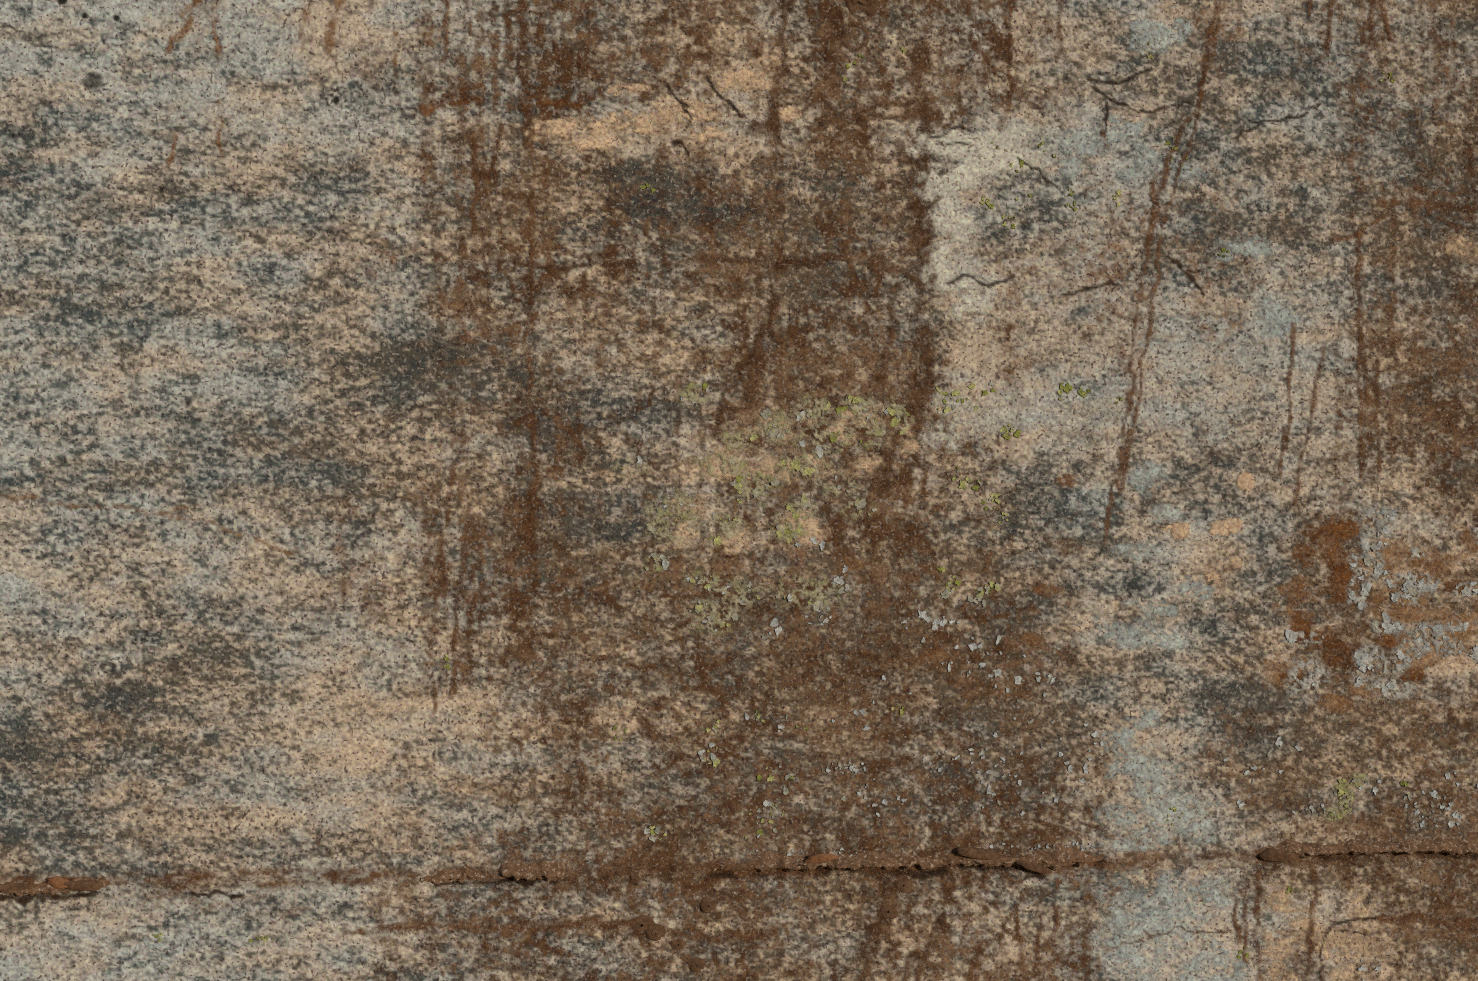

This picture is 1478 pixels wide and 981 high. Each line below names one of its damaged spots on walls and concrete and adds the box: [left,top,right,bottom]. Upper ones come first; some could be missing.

leakage [326,0,344,53]
rust [420,84,482,115]
leakage [350,0,1117,981]
leakage [1231,0,1478,981]
rust [1265,520,1362,683]
rust [1372,528,1478,681]
crack [1314,852,1478,860]
crack [0,891,100,905]
crack [191,890,244,898]
crack [435,878,565,887]
crack [711,865,1045,879]